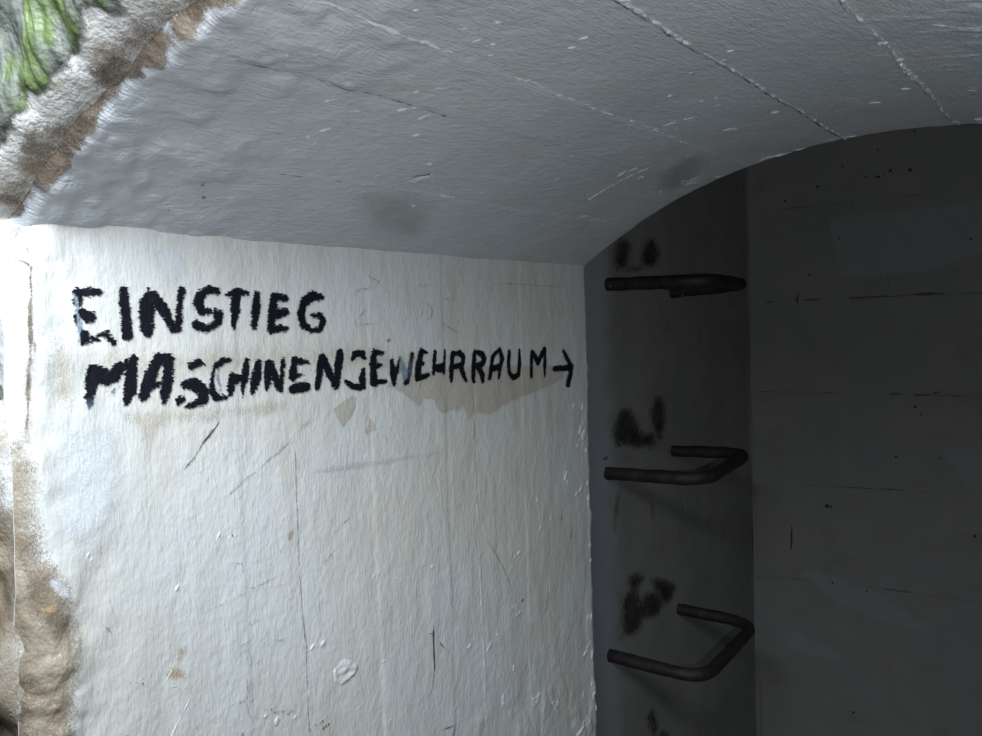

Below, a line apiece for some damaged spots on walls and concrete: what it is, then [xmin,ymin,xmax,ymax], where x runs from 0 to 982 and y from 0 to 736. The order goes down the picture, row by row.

leakage [0,0,239,219]